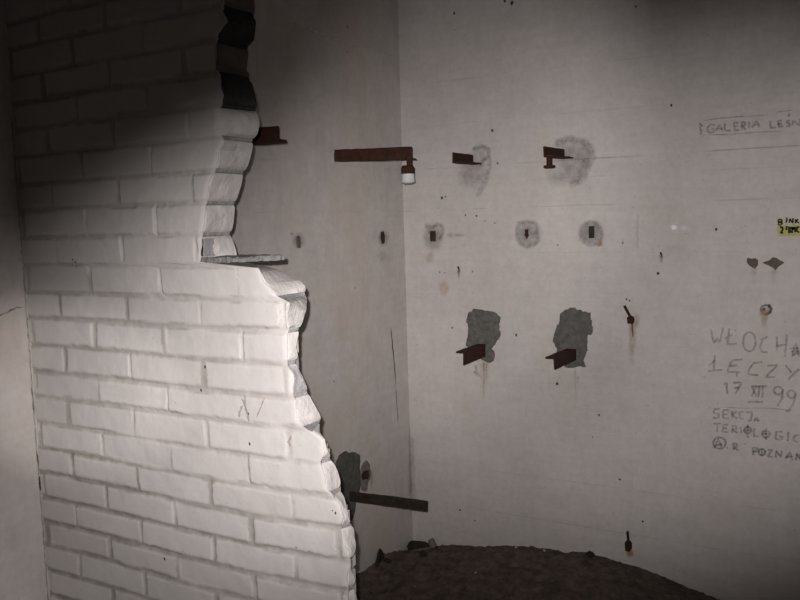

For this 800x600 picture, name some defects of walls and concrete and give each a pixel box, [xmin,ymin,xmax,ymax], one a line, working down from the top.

spalling [200,0,357,600]
flaking render [360,460,371,492]